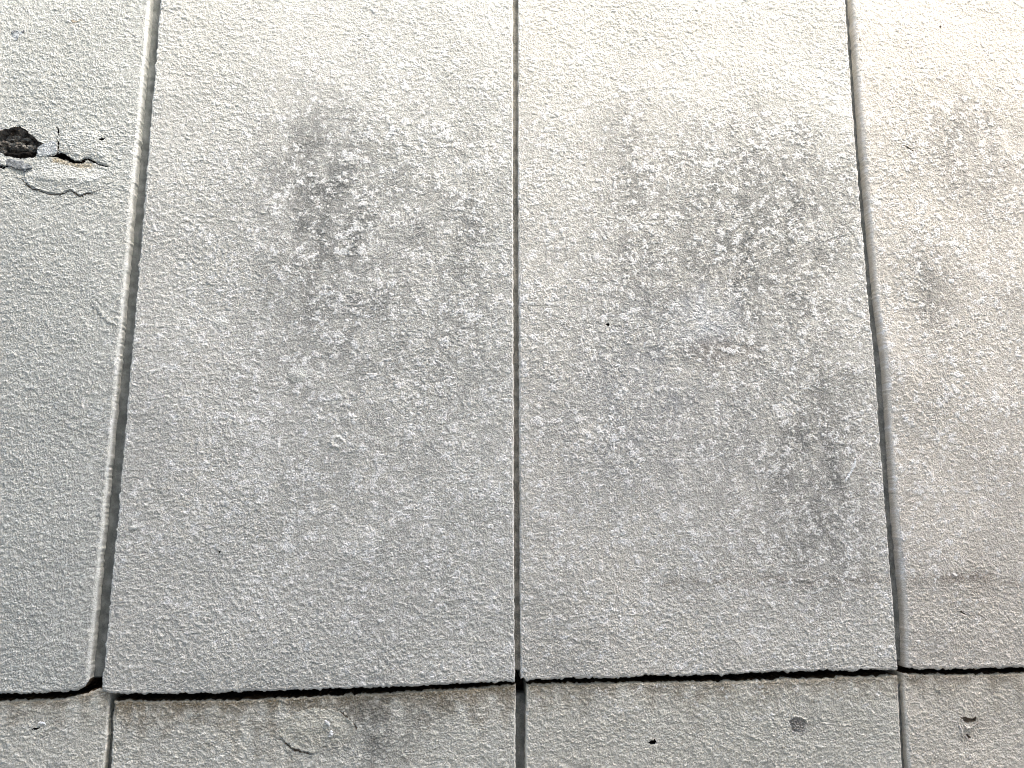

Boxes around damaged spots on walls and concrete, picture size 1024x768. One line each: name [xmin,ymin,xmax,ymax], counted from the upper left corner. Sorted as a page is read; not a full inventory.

peeling [0,126,111,172]